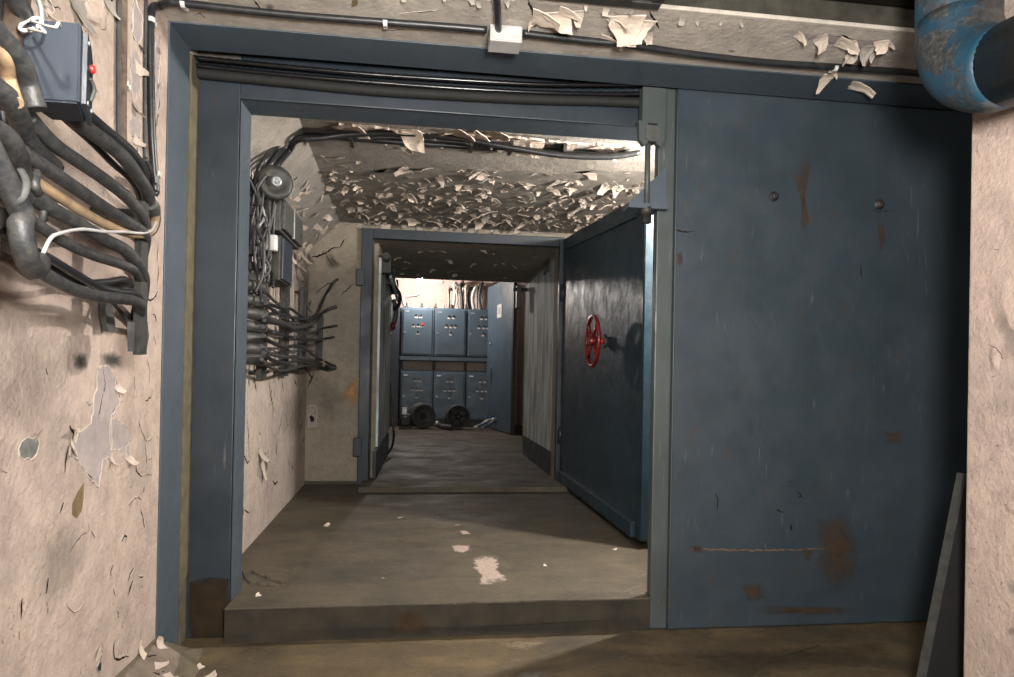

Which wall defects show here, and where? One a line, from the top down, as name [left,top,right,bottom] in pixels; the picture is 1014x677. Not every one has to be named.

peeling [42,0,62,22]
peeling [468,0,515,9]
peeling [528,0,588,35]
peeling [601,7,659,47]
peeling [70,0,164,157]
peeling [794,31,895,94]
peeling [847,81,876,99]
peeling [289,123,654,311]
peeling [65,364,139,488]
spalling [257,447,275,482]